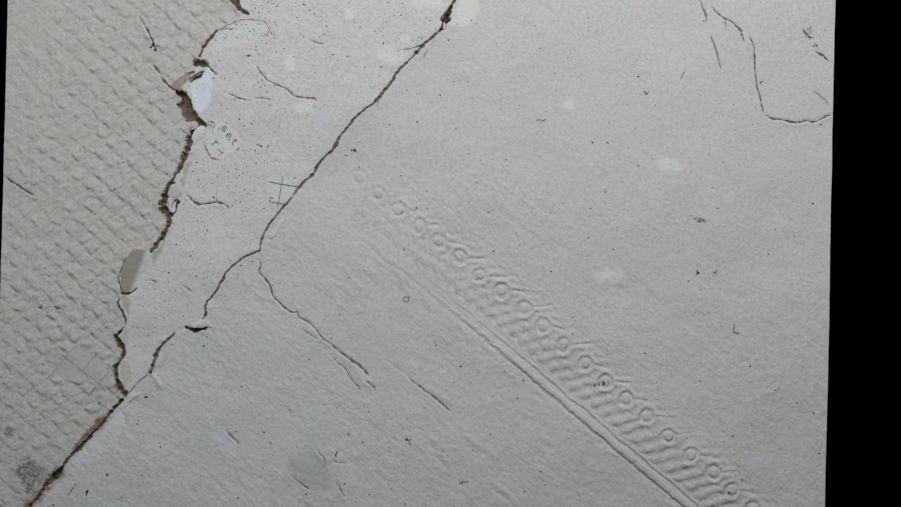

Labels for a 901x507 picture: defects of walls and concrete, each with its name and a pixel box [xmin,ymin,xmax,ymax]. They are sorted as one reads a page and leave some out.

crack [700,0,830,123]
peeling [190,68,216,114]
peeling [191,126,205,146]
crack [6,177,34,195]
peeling [121,249,149,293]
crack [28,0,456,507]